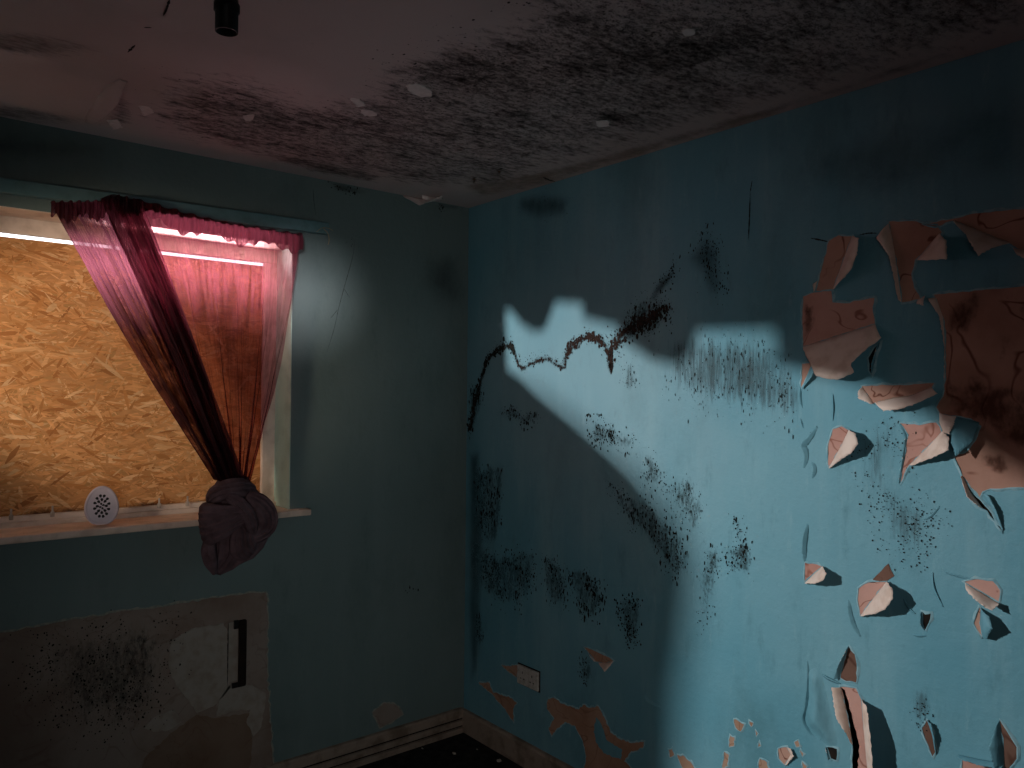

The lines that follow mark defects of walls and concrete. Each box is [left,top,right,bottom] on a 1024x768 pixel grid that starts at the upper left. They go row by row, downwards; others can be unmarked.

water stain [164,0,999,195]
water stain [466,222,729,439]
peeling [799,206,1024,534]
water stain [471,464,643,650]
water stain [585,413,707,586]
water stain [703,513,755,582]
peeling [803,561,827,584]
peeling [856,564,894,617]
water stain [855,471,952,572]
peeling [962,576,1003,639]
peeling [825,645,873,768]
peeling [958,718,1021,768]